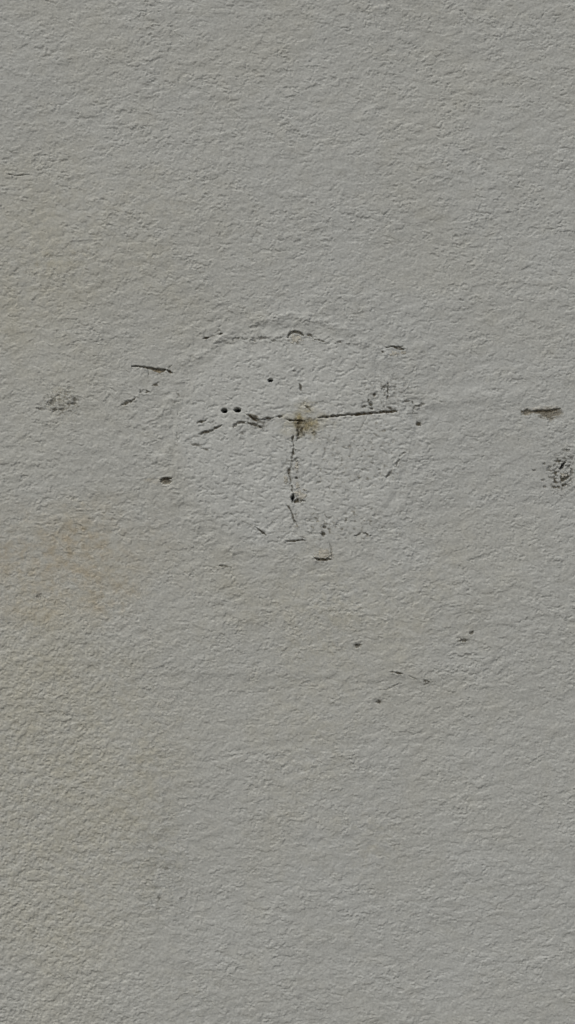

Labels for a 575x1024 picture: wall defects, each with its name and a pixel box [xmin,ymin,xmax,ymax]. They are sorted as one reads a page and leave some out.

crack [299,384,418,418]
crack [197,414,282,450]
crack [284,444,300,542]